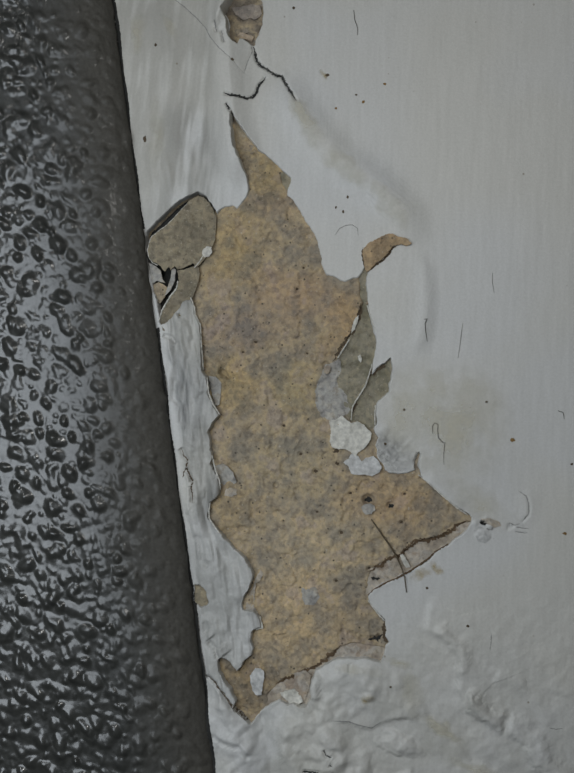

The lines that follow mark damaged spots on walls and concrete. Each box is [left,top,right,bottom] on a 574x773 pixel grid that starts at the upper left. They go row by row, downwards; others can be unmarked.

crack [175,0,296,115]
peeling [225,0,264,46]
peeling [147,116,501,722]